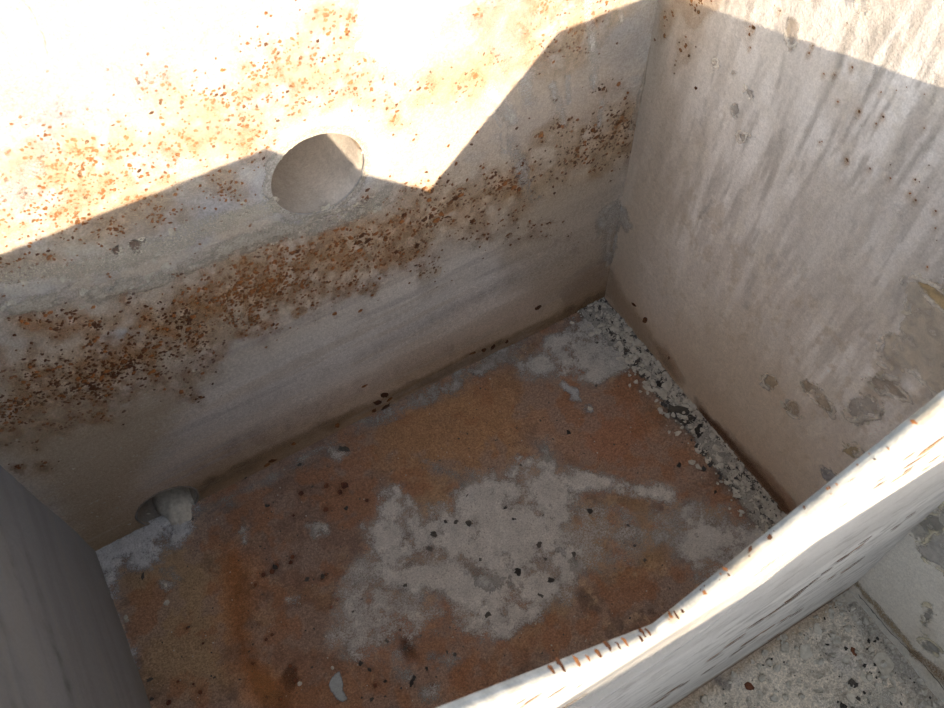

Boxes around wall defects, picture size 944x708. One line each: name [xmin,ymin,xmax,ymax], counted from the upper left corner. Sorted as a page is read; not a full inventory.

rust [0,0,636,469]
rust [700,411,805,514]
rust [836,436,944,514]
damp [327,436,762,662]
peeling [915,502,944,575]
rust [516,684,586,708]
rust [572,637,630,667]
rust [699,536,872,689]